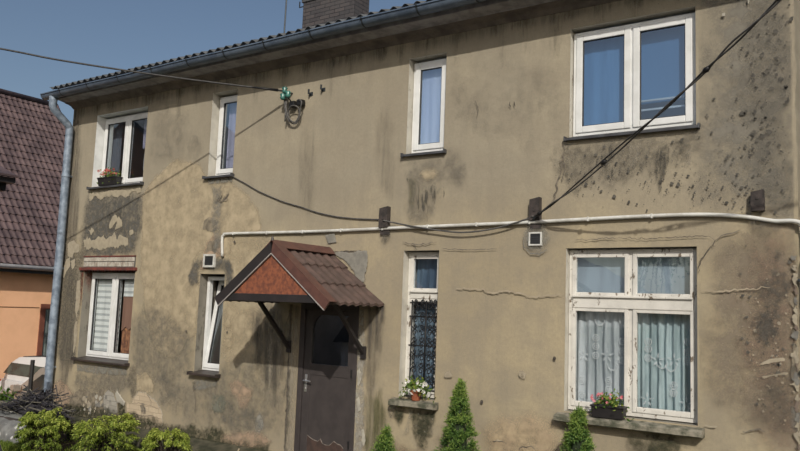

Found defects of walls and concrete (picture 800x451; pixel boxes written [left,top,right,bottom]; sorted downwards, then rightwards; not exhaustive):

water stain [563,7,793,215]
flaking render [83,187,141,256]
crack [577,230,739,271]
crack [703,285,770,293]
spalling [737,253,800,450]
flaking render [69,389,163,429]